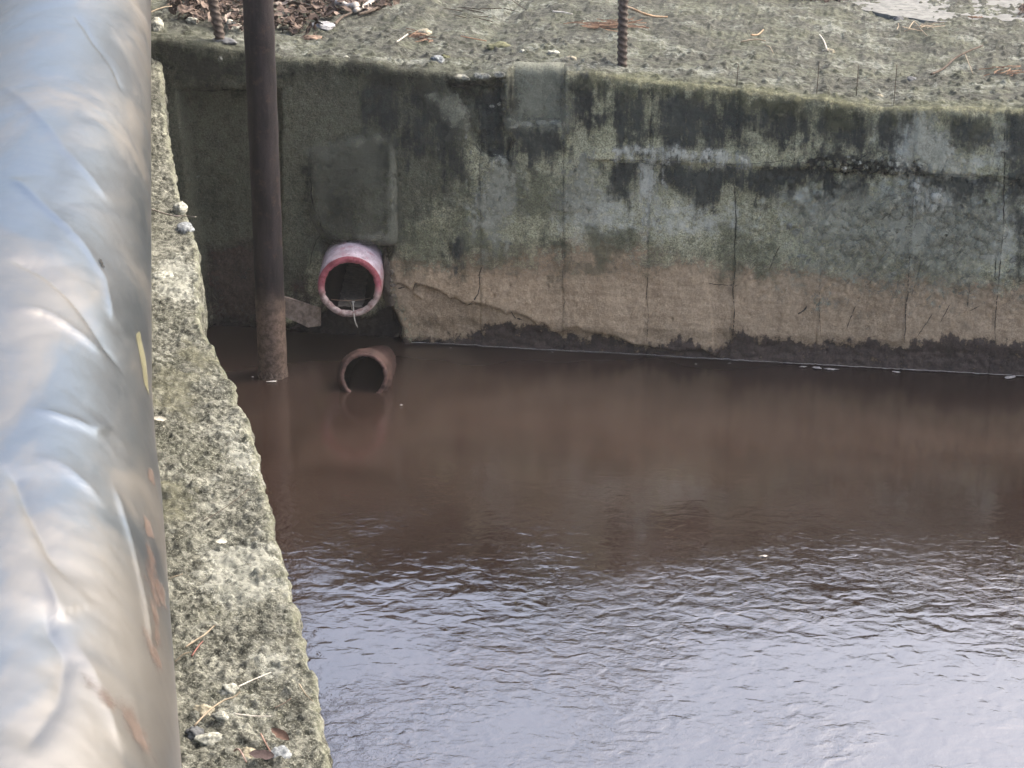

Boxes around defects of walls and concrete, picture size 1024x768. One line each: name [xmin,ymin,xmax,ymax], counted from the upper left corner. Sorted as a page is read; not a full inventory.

rust [203,239,256,324]
damp [302,75,471,240]
crack [398,265,483,305]
damp [287,304,1024,377]
damp [441,70,1024,282]
crack [609,111,1005,343]